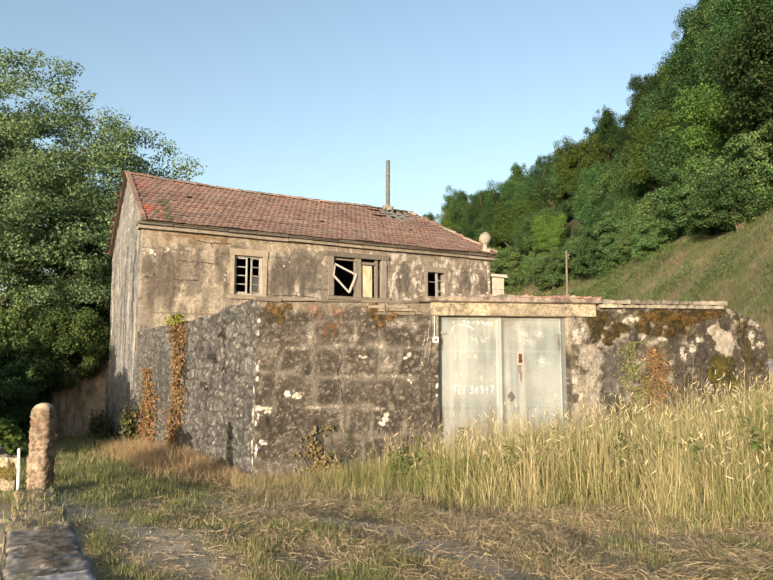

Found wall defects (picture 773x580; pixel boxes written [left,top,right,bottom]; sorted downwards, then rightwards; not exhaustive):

crack [332,347,359,406]